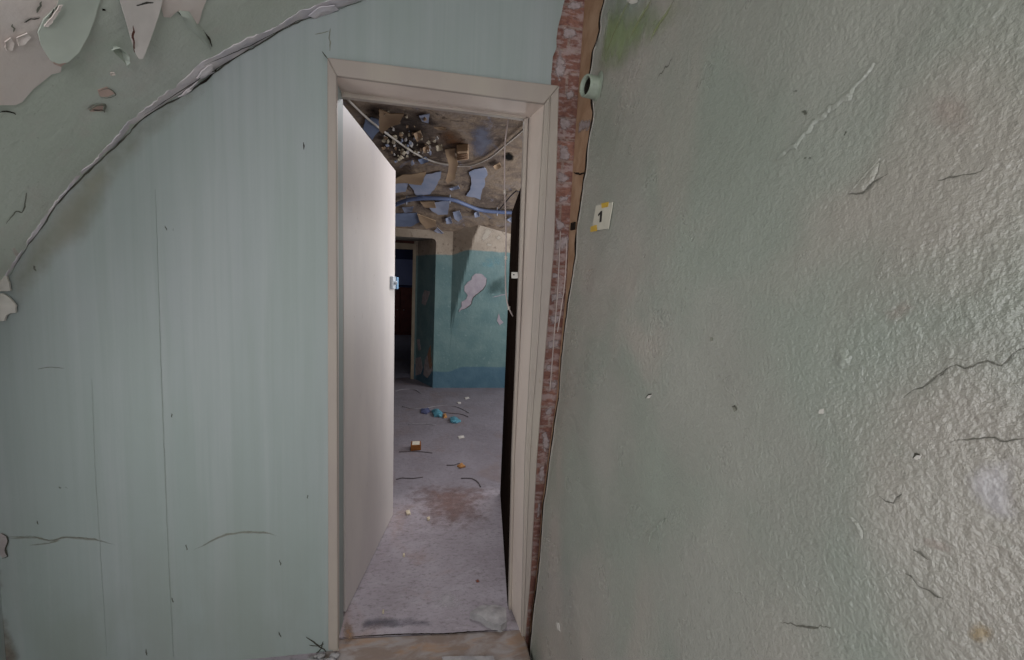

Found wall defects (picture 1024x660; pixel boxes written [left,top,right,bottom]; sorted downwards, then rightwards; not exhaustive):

peeling [112,0,212,68]
peeling [0,0,100,115]
flaking render [88,72,116,113]
peeling [0,276,17,321]
peeling [459,274,487,311]
crack [903,341,1024,398]
crack [952,435,1023,443]